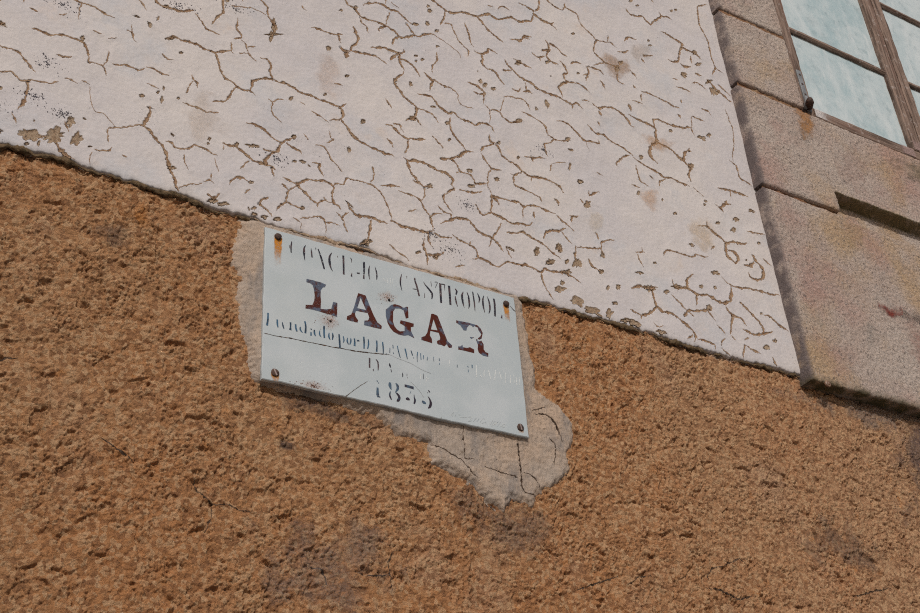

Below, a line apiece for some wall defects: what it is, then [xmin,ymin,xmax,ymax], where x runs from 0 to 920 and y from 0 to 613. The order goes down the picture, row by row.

spalling [17,116,92,147]
crack [0,0,788,365]
spalling [533,242,641,328]
crack [265,333,429,397]
crack [435,426,540,502]
crack [534,407,563,464]